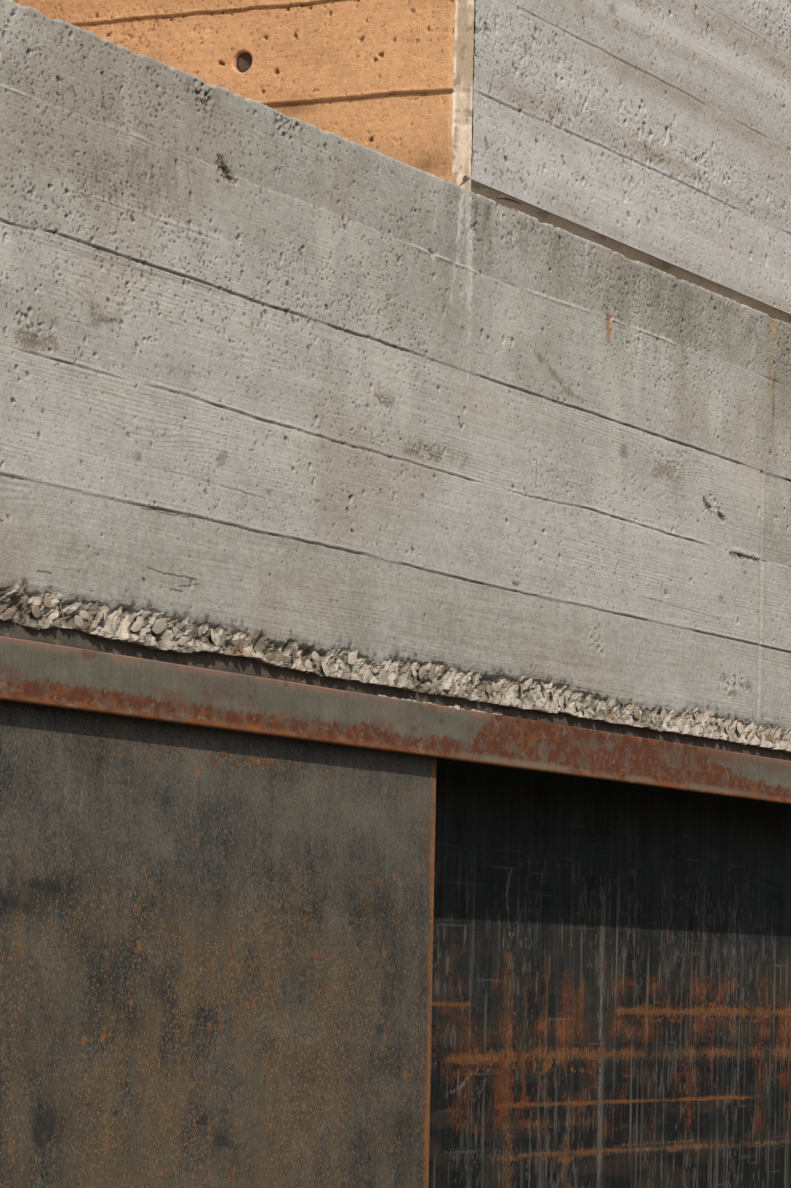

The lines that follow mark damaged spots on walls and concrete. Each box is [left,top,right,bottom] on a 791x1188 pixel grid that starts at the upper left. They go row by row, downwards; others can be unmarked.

spalling [0,584,791,753]
corrosion [445,952,760,1188]
corrosion [624,1001,791,1037]